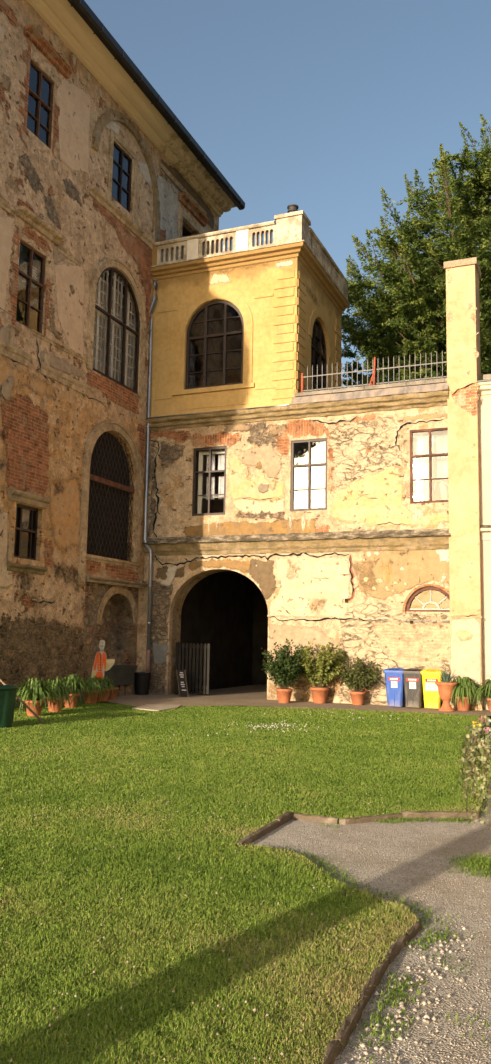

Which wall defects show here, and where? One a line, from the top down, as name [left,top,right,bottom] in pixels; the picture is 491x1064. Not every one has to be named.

flaking render [0,78,219,357]
flaking render [0,511,13,589]
flaking render [2,376,82,569]
crack [151,440,389,622]
flaking render [183,383,479,536]
crack [390,381,477,448]
flaking render [0,615,84,707]